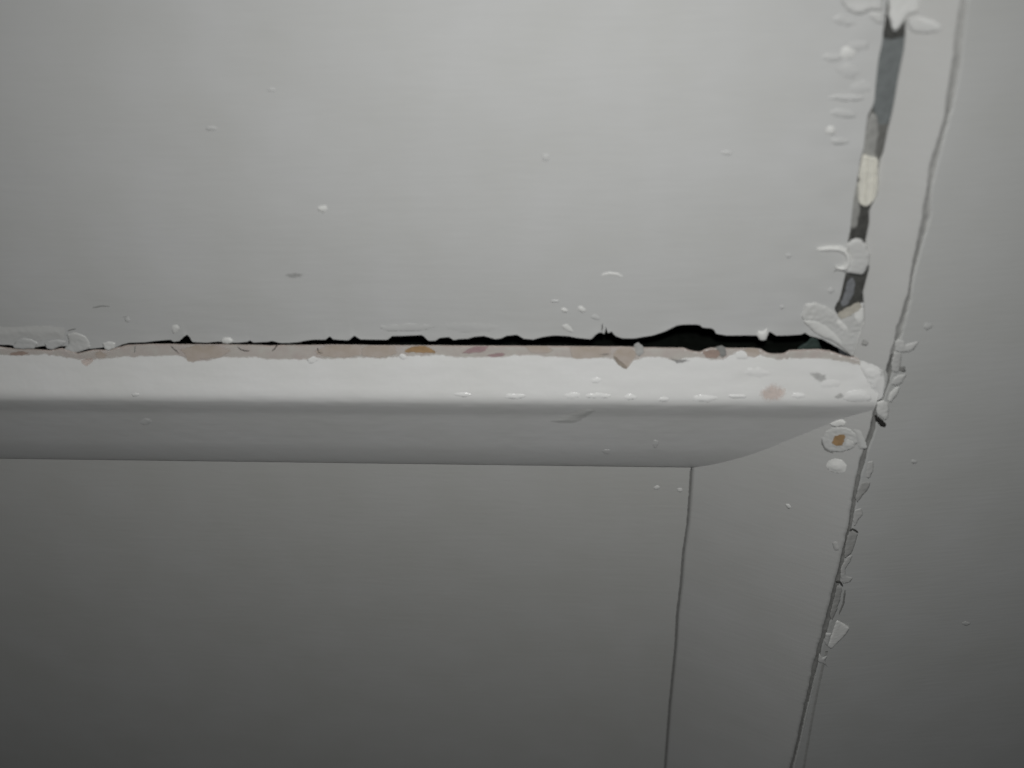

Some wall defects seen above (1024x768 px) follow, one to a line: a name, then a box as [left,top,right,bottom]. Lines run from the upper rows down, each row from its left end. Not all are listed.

peeling [841,0,943,33]
peeling [817,237,870,275]
crack [0,324,839,354]
spalling [0,302,864,369]
crack [790,0,967,768]
spalling [821,420,867,453]
crack [664,469,692,768]
peeling [818,620,849,666]